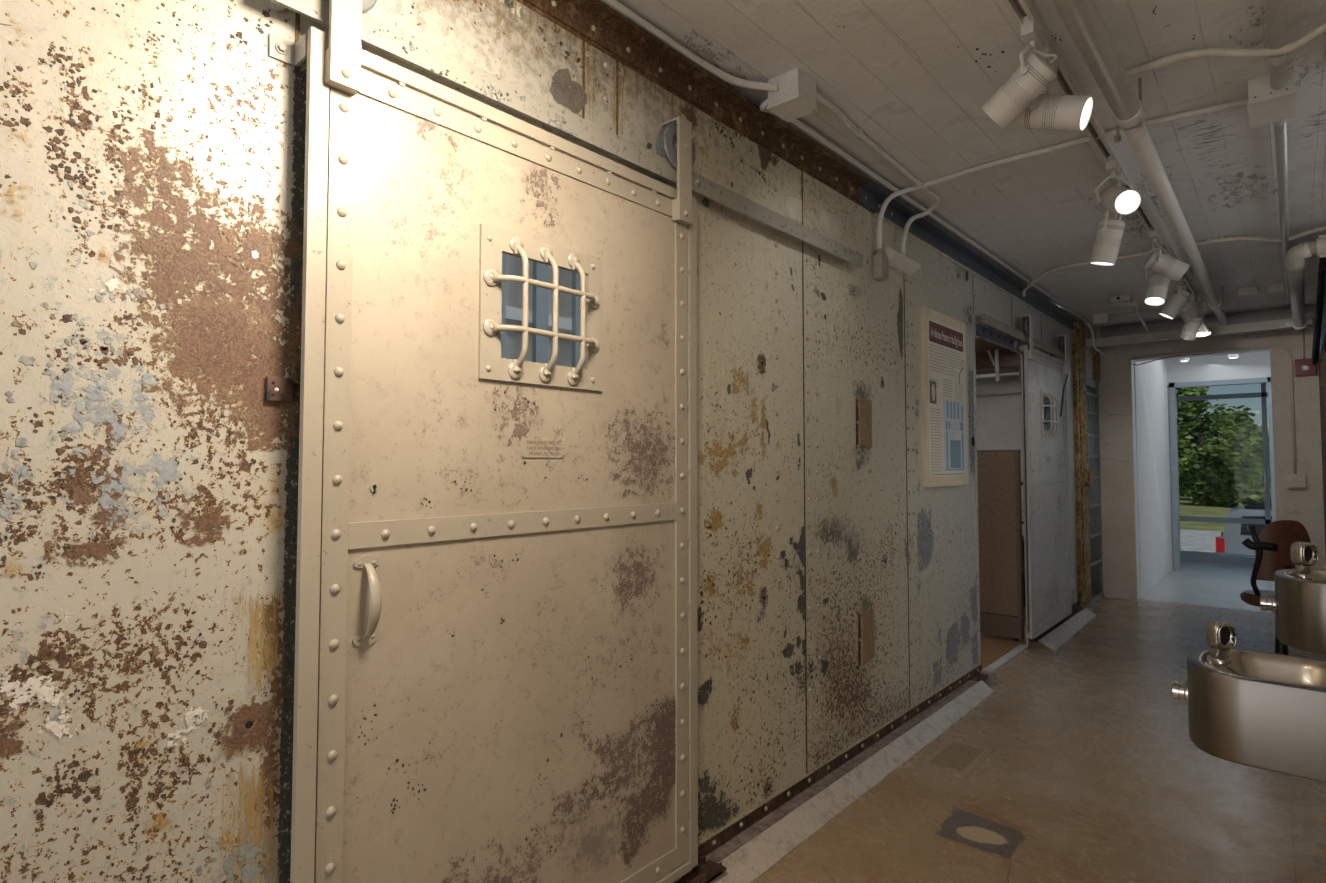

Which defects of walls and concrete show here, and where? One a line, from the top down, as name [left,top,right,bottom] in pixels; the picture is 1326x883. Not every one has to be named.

spalling [139,2,202,56]
spalling [230,0,273,45]
spalling [0,47,169,257]
rust [757,144,778,171]
peeling [0,302,256,581]
spalling [0,596,222,713]
peeling [698,514,760,706]
peeling [777,526,837,621]
rust [805,613,913,773]
spalling [34,759,102,842]
spalling [99,699,234,883]
peeling [698,770,739,841]